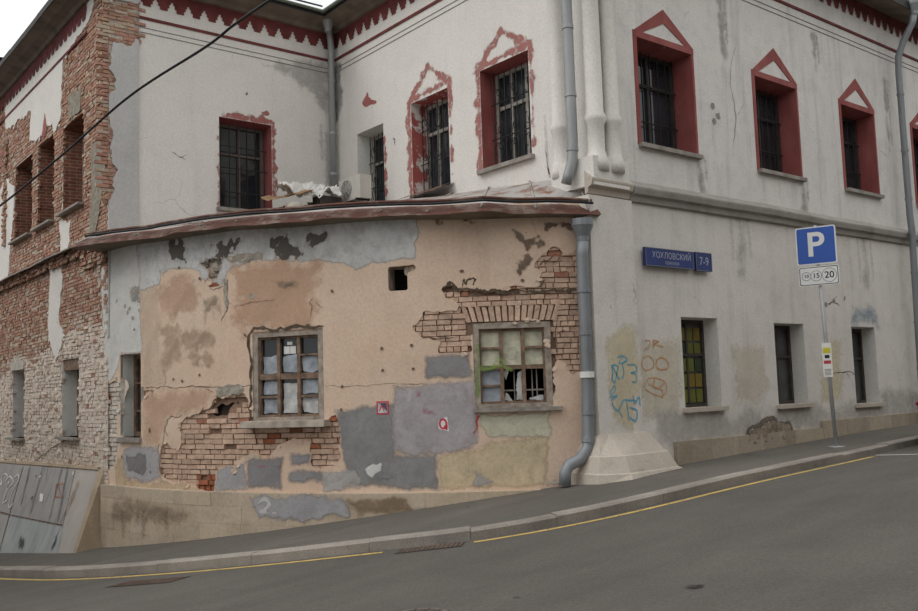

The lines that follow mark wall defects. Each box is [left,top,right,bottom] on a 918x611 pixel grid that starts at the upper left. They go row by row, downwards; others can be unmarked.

peeling [405,63,453,198]
peeling [474,27,535,176]
spalling [0,0,419,491]
crack [146,298,322,417]
spalling [410,217,581,395]